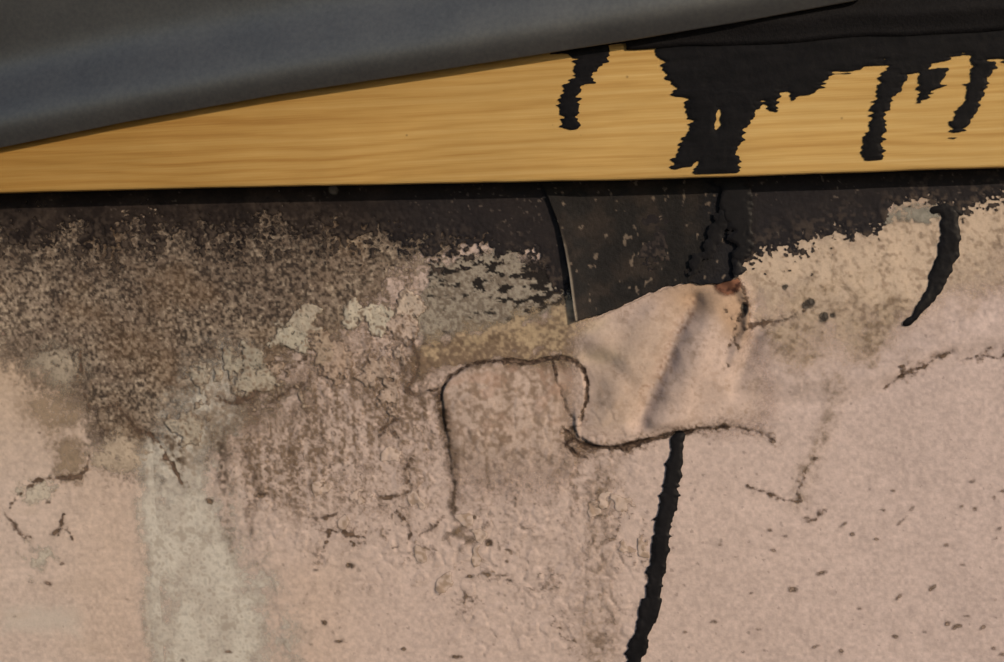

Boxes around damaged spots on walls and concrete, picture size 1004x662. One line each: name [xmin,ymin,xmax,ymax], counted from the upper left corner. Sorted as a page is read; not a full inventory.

leakage [0,206,589,514]